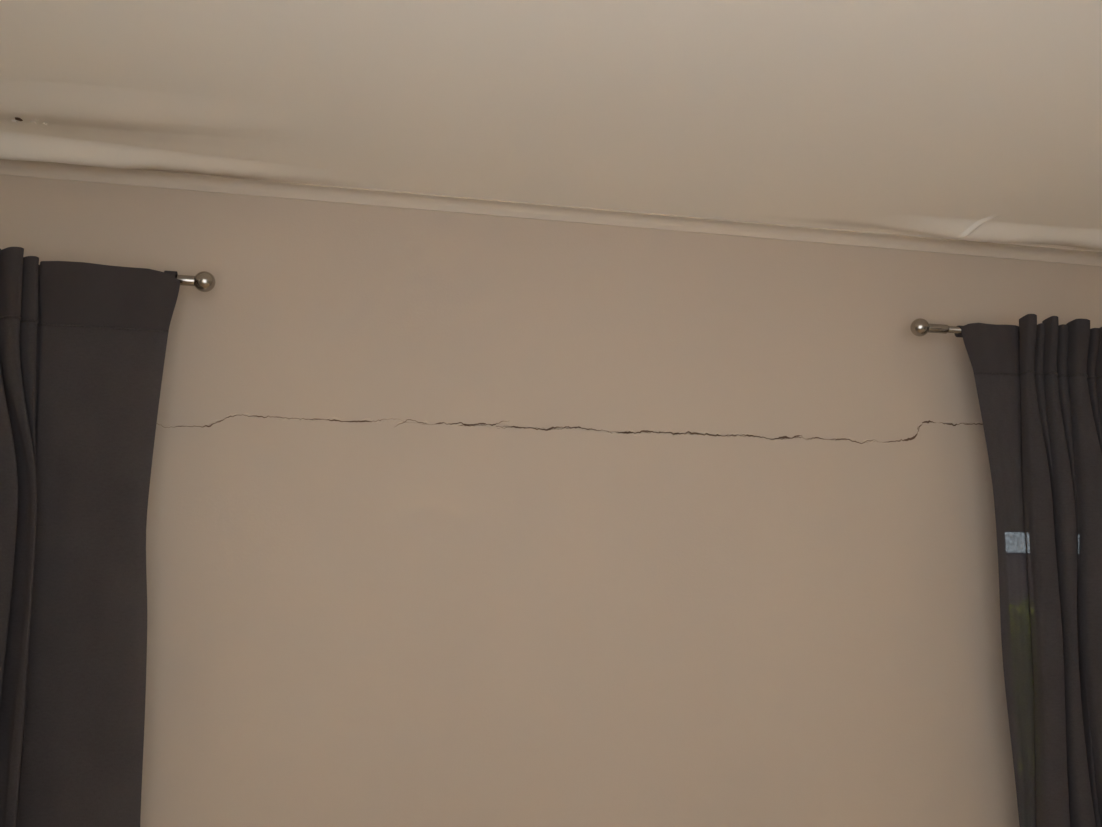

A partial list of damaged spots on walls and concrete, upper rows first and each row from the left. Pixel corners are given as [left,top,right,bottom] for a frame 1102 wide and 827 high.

crack [158,413,983,444]